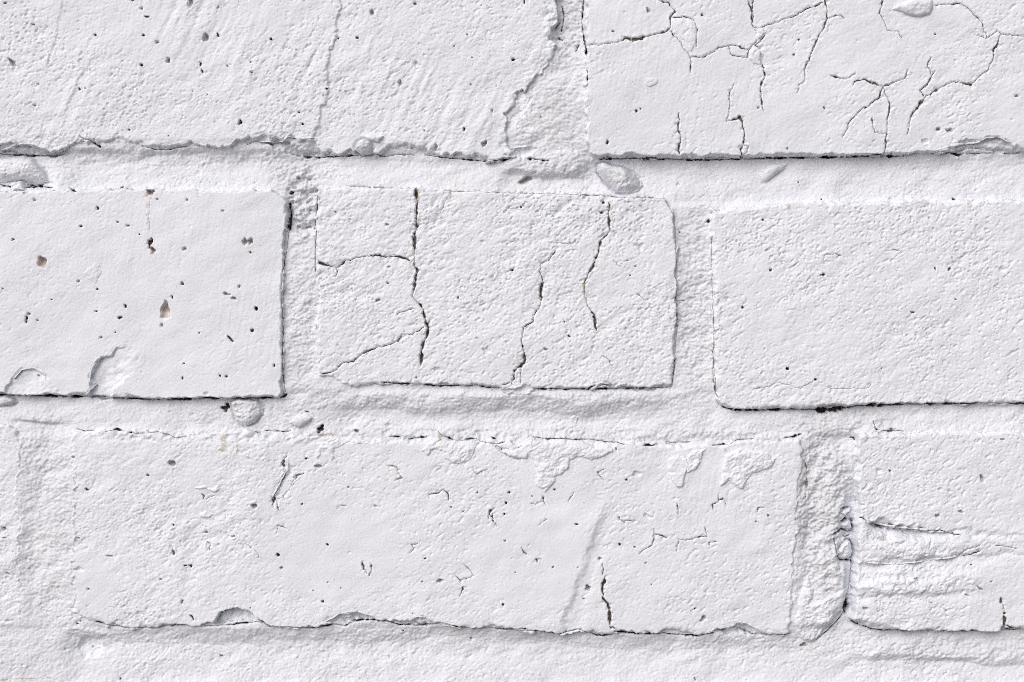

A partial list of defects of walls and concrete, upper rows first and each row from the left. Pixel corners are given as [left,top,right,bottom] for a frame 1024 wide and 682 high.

crack [586,0,843,158]
crack [832,3,1019,155]
crack [319,189,449,374]
crack [511,203,629,384]
spalling [0,367,60,396]
spalling [86,343,147,399]
crack [601,564,615,629]